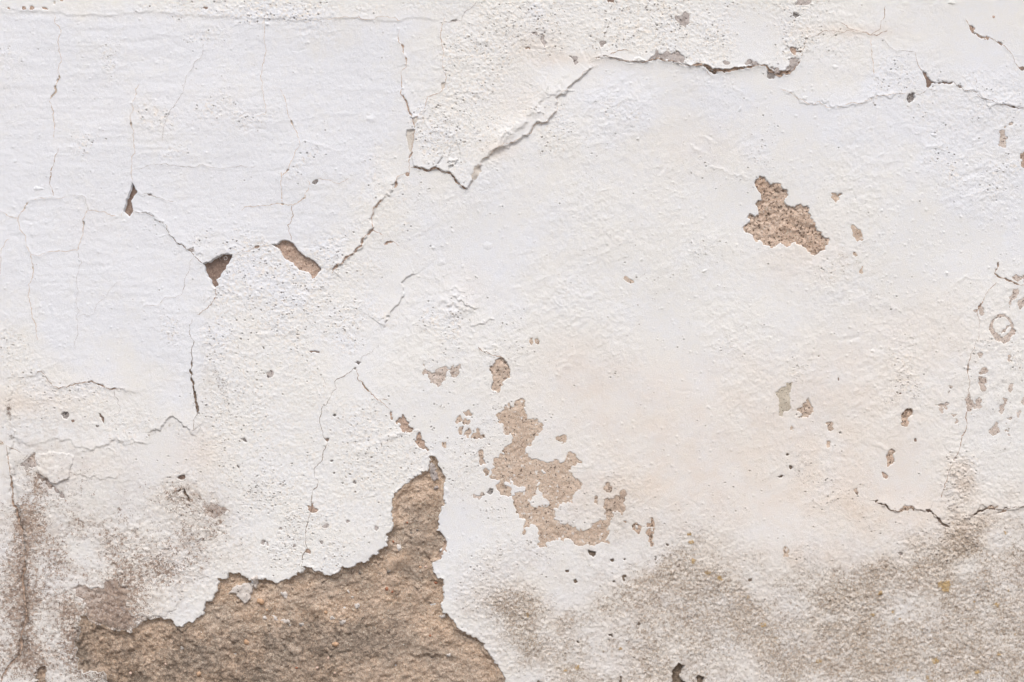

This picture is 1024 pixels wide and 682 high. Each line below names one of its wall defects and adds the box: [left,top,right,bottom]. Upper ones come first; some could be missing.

crack [1,446,29,682]
damp [0,457,233,682]
crack [0,14,256,345]
crack [189,290,238,449]
spalling [204,255,232,287]
flaking render [72,412,505,682]
spalling [274,241,321,279]
peeling [455,398,669,557]
crack [329,1,1019,273]
damp [470,479,1024,682]
peeling [743,176,829,256]
crack [871,262,1024,528]